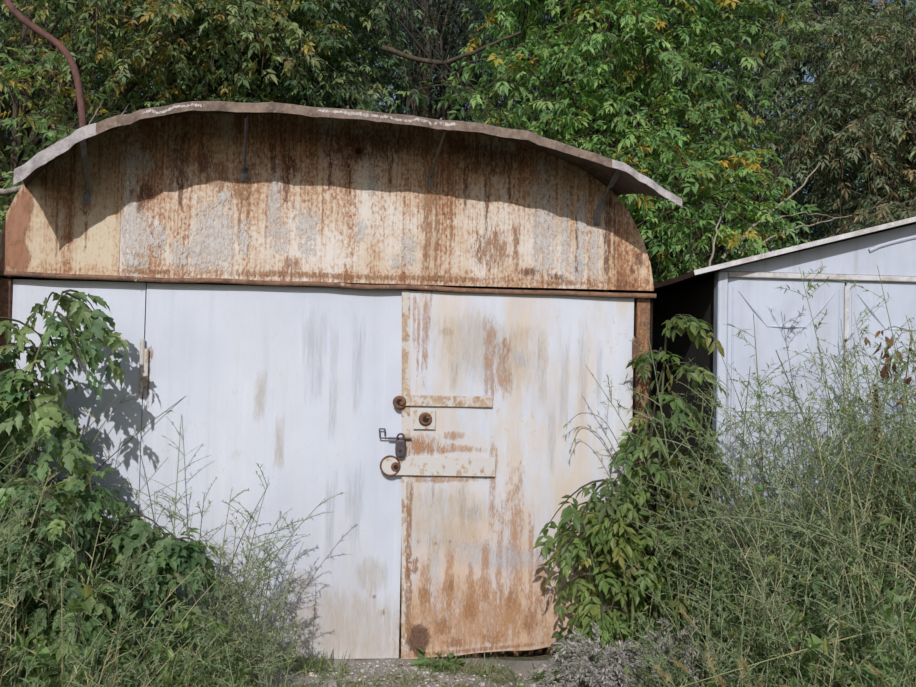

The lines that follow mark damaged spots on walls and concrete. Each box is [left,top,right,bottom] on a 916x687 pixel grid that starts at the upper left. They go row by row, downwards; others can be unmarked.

rust [0,186,34,271]
rust [55,148,91,257]
rust [129,181,154,214]
rust [170,129,253,245]
rust [209,125,591,285]
rust [603,198,617,290]
rust [413,300,430,368]
rust [484,329,512,393]
rust [412,432,481,453]
rust [404,476,550,656]